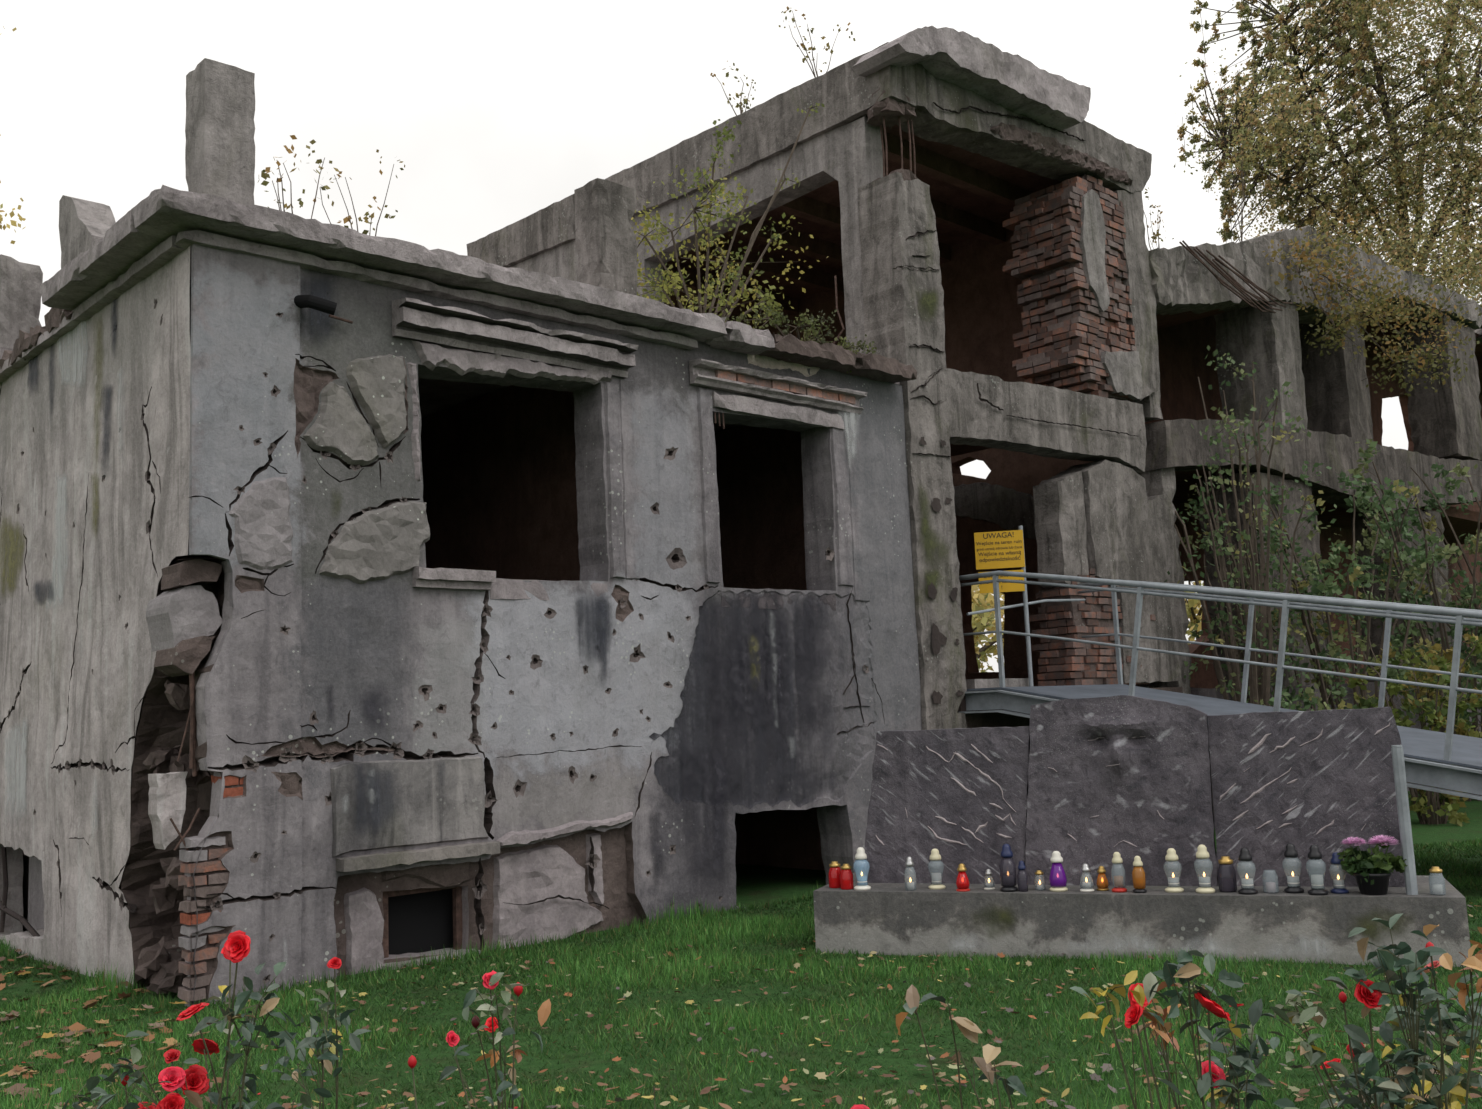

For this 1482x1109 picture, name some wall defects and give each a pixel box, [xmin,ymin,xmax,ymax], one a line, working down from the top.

crack [893,230,939,271]
spalling [293,358,340,457]
crack [0,488,30,605]
crack [0,663,31,733]
crack [51,354,652,1007]
damp [578,597,609,675]
spalling [611,584,634,622]
spalling [177,831,236,1006]